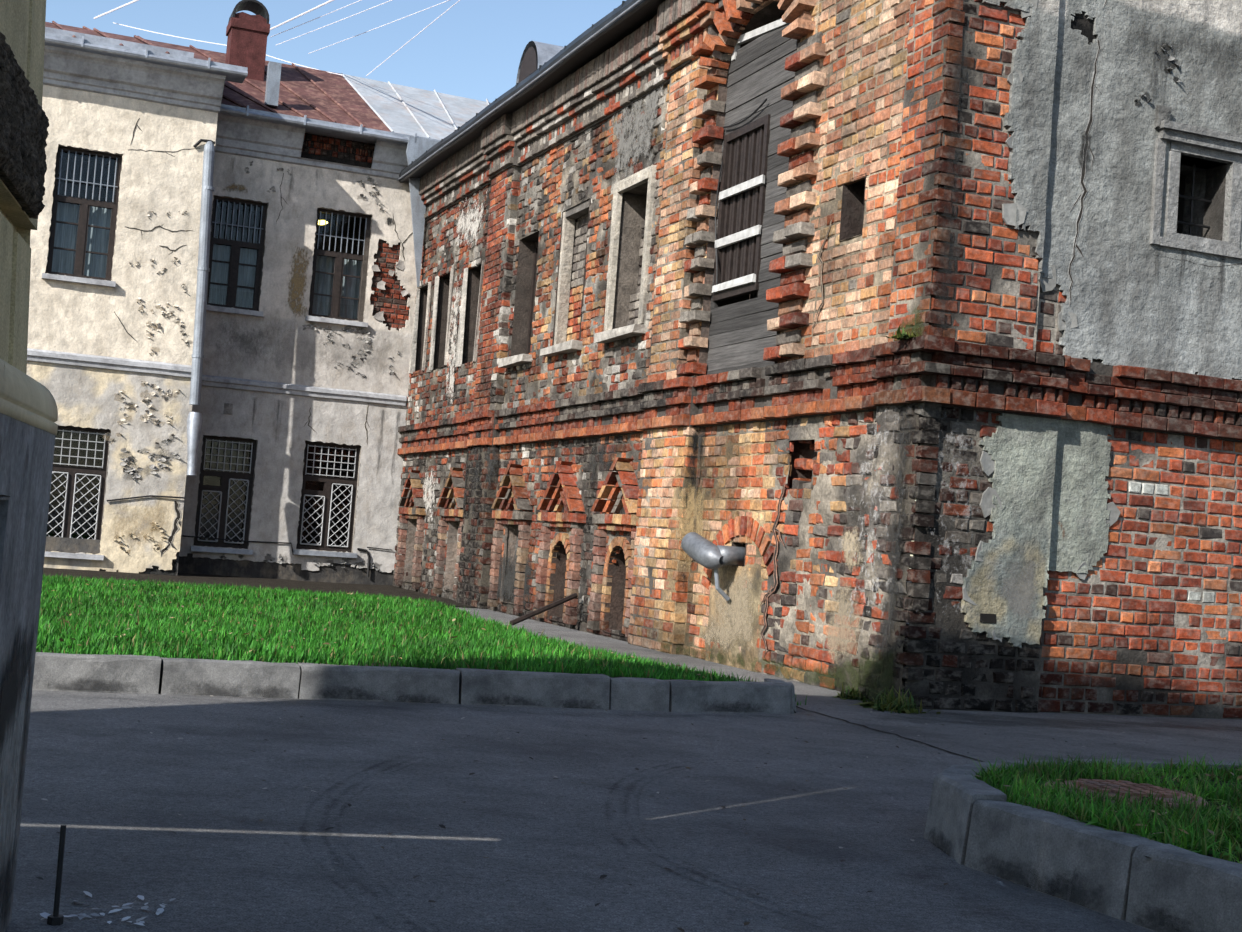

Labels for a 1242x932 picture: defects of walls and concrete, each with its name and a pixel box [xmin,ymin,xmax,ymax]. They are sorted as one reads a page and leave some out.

spalling [1071,12,1096,44]
crack [1068,40,1102,307]
flaking render [1002,203,1027,226]
flaking render [303,311,385,378]
peeling [106,381,181,481]
flaking render [979,451,1003,518]
peeling [113,522,168,553]
flaking render [1106,502,1121,527]
spalling [962,586,1003,642]